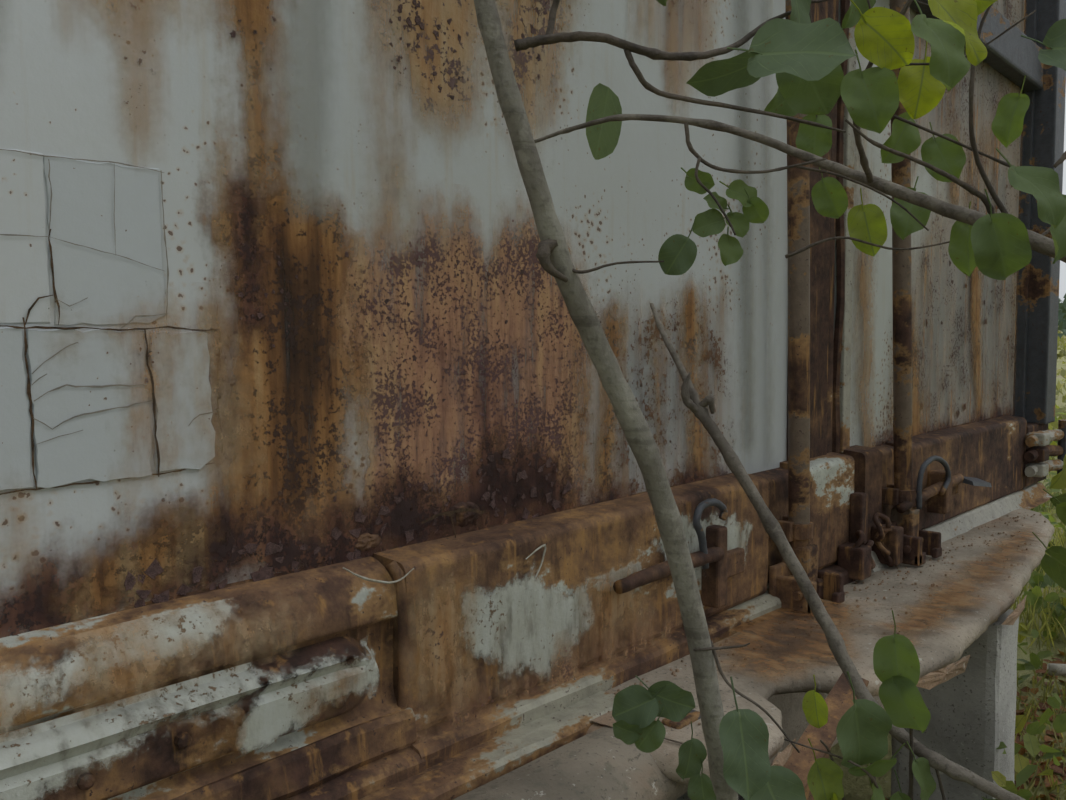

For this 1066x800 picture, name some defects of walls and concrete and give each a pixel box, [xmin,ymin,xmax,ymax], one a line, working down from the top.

rust [500,0,573,135]
rust [935,61,1023,215]
crack [0,149,223,495]
rust [0,178,644,638]
rust [600,273,735,486]
rust [859,252,893,448]
rust [911,216,1019,436]
peeling [0,599,379,800]
rust [418,587,474,709]
peeling [460,544,594,677]